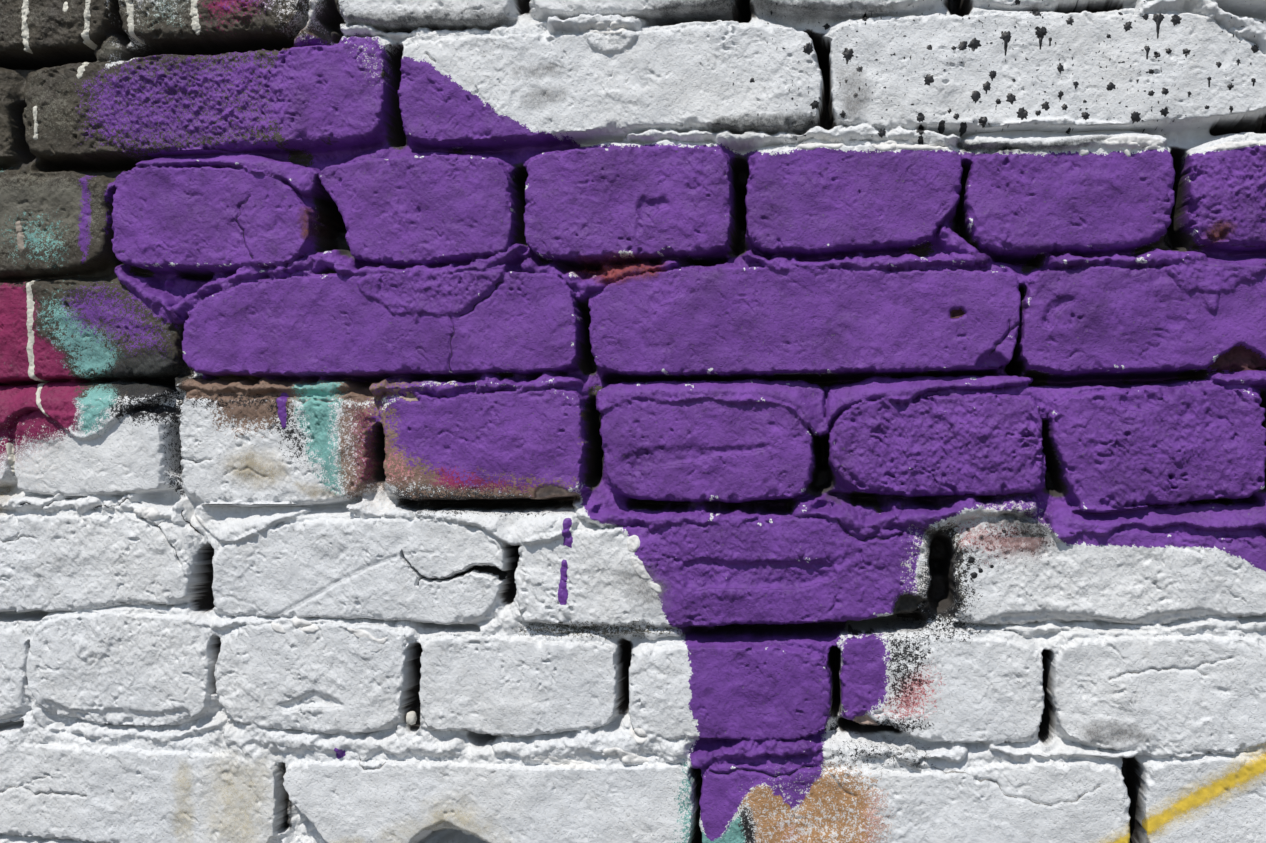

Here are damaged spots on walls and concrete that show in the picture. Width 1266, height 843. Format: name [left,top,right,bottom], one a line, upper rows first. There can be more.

crack [214,551,515,617]